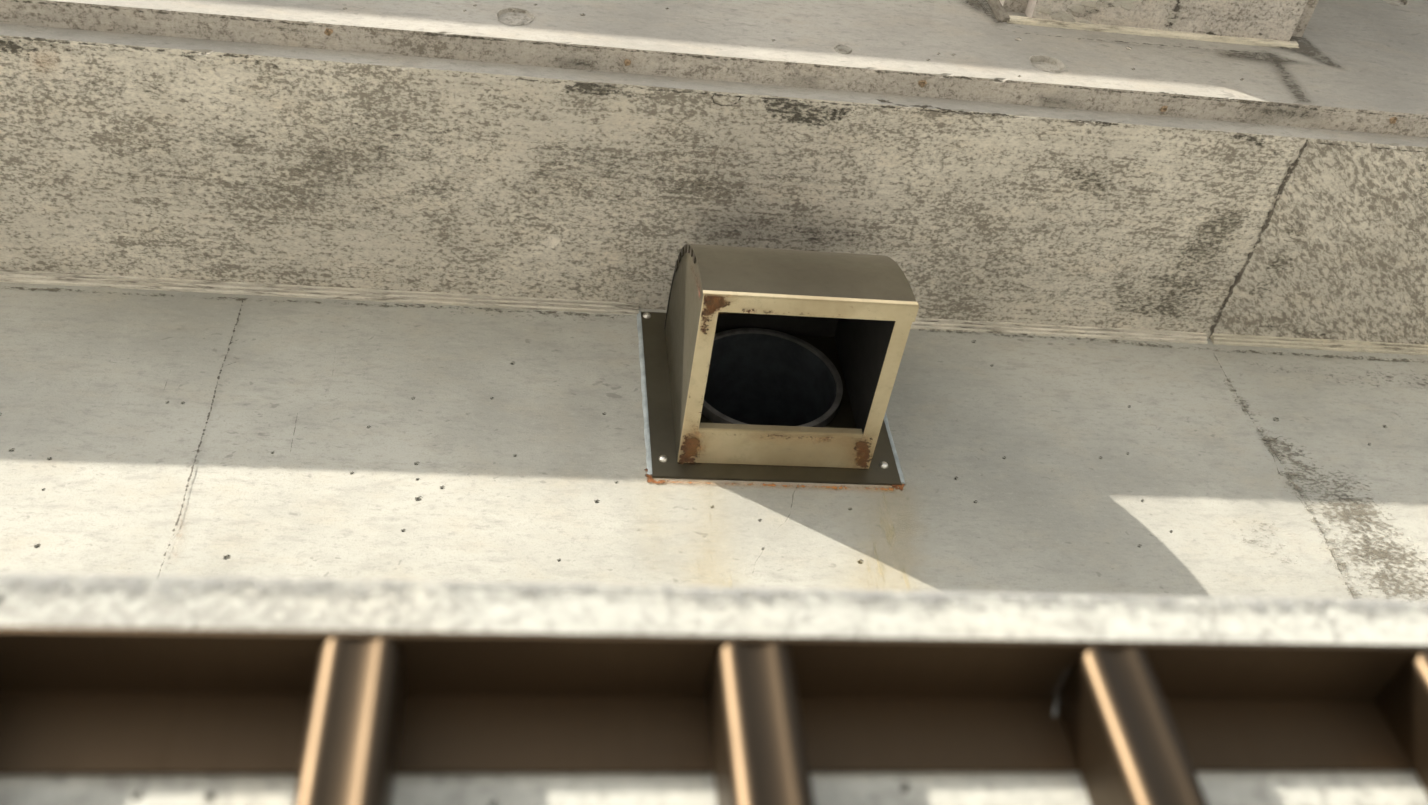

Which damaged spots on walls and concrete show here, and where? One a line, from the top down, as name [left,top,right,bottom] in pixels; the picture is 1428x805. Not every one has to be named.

crack [158,300,243,578]
leakage [444,379,1428,614]
crack [1210,140,1354,598]